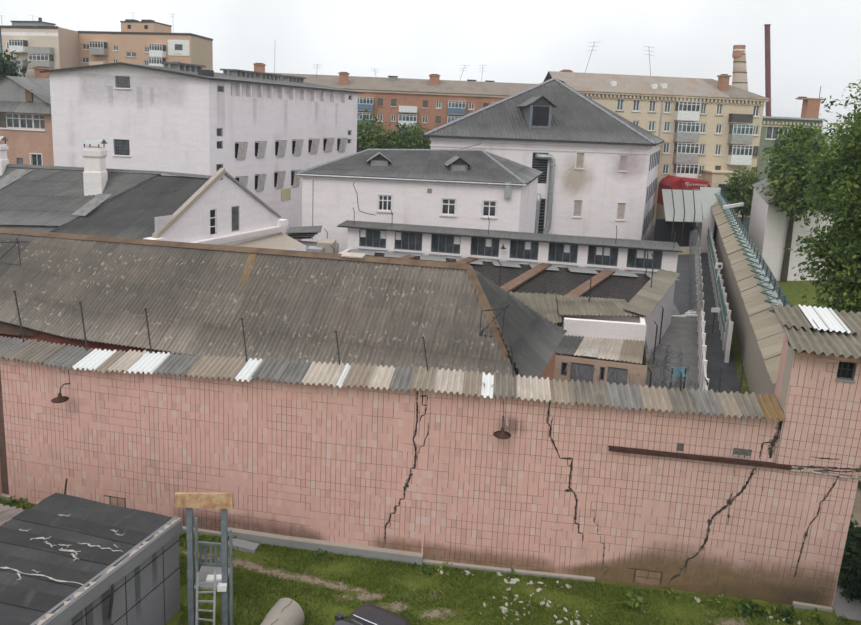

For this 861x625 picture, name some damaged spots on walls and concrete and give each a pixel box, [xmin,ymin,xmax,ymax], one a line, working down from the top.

crack [384,391,429,546]
crack [546,401,609,578]
crack [668,421,782,587]
crack [791,457,861,578]